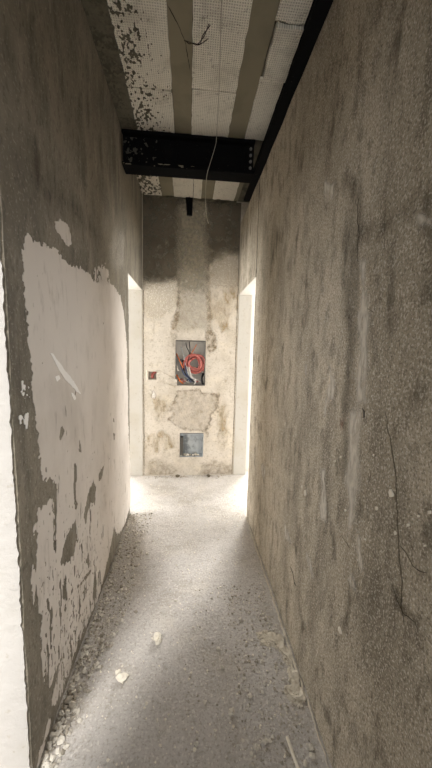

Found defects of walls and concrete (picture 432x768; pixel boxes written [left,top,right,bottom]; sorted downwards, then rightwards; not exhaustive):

damp [136,175,241,329]
peeling [19,219,131,706]
crack [385,413,427,630]
peeling [37,718,51,768]